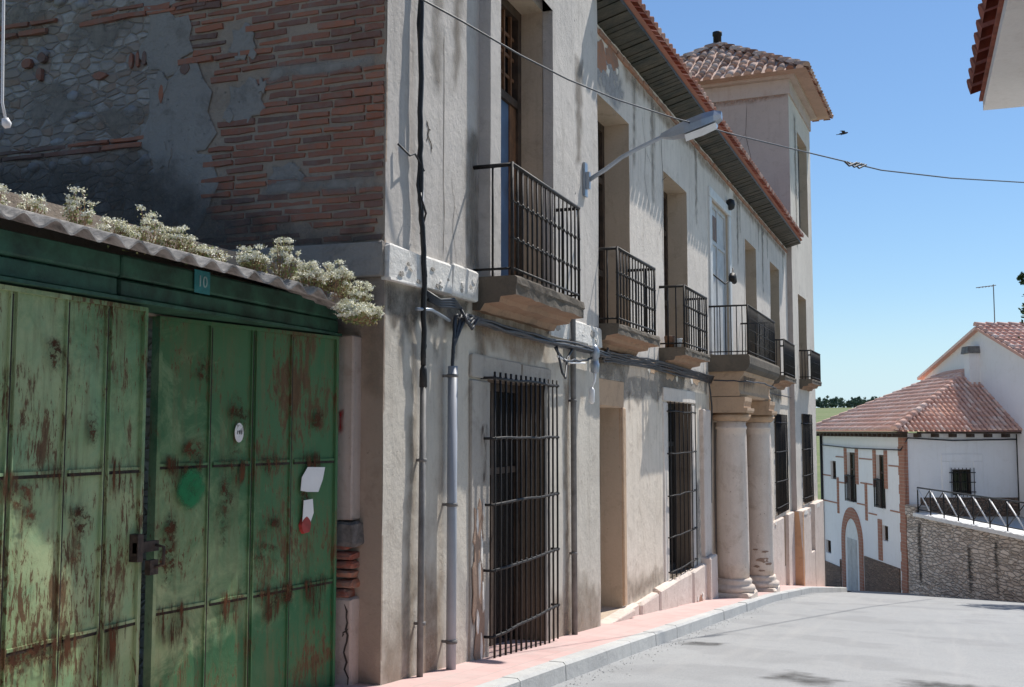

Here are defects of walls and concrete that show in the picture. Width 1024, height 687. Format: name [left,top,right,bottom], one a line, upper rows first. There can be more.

rust [49,338,62,368]
rust [302,453,320,467]
rust [47,464,91,563]
rust [159,516,177,579]
peeling [472,498,485,660]
rust [0,627,78,682]
rust [96,620,126,673]
rust [157,602,188,648]
crack [341,604,349,685]